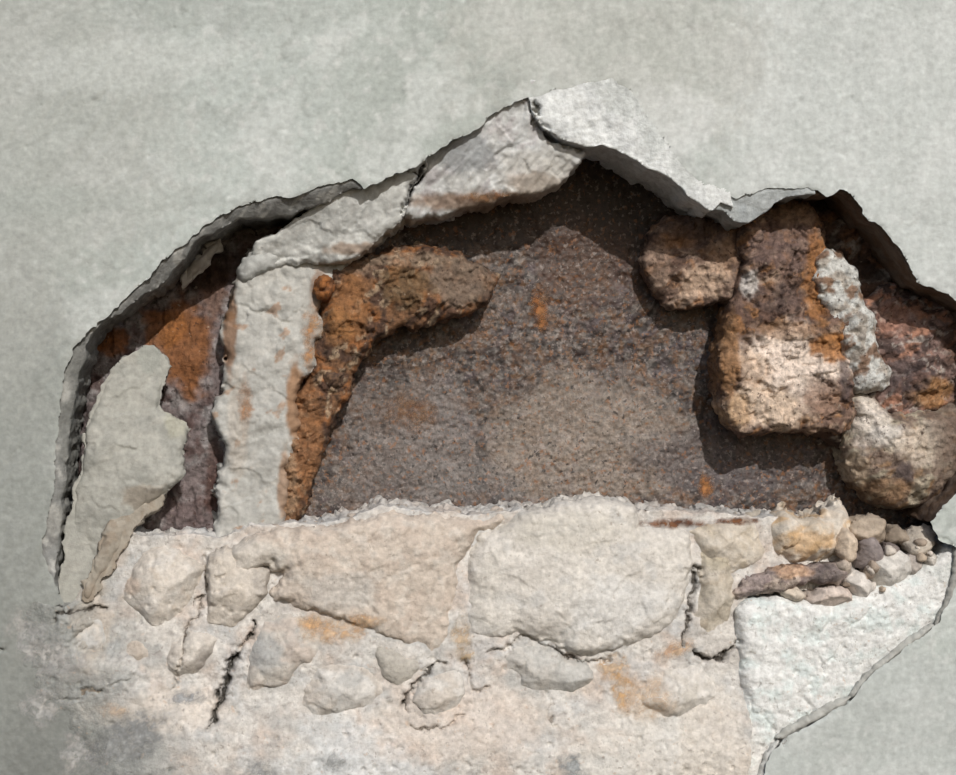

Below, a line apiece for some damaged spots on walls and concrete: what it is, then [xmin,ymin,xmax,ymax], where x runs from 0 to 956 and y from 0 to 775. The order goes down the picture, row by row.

spalling [528,78,956,311]
rust [77,226,278,531]
peeling [42,179,363,603]
crack [212,619,256,723]
crack [681,565,731,661]
rust [706,199,857,438]
peeling [734,535,956,775]
spalling [903,471,956,522]